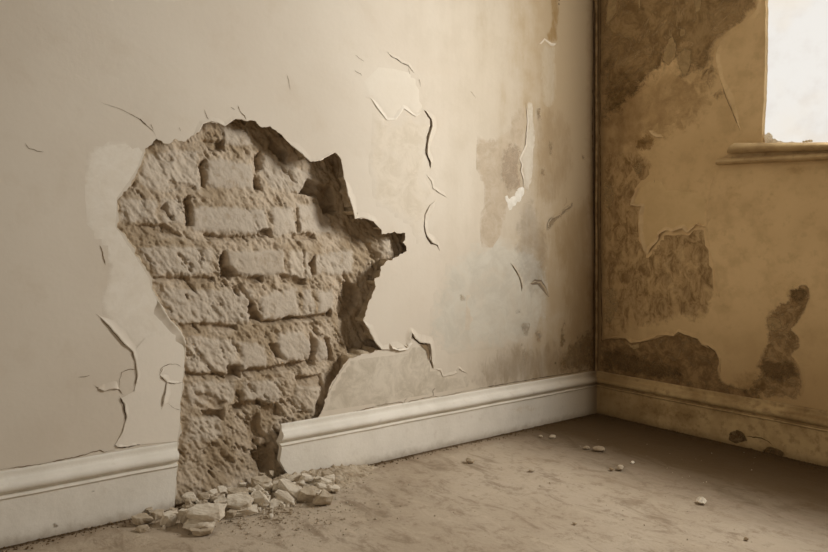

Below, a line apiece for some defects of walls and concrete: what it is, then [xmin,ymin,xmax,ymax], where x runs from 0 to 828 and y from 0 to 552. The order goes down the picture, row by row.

flaking render [85,115,471,504]
peeling [365,67,424,120]
crack [354,0,603,412]
leakage [429,108,549,355]
peeling [505,102,535,210]
peeling [600,148,760,399]
leakage [755,285,809,398]